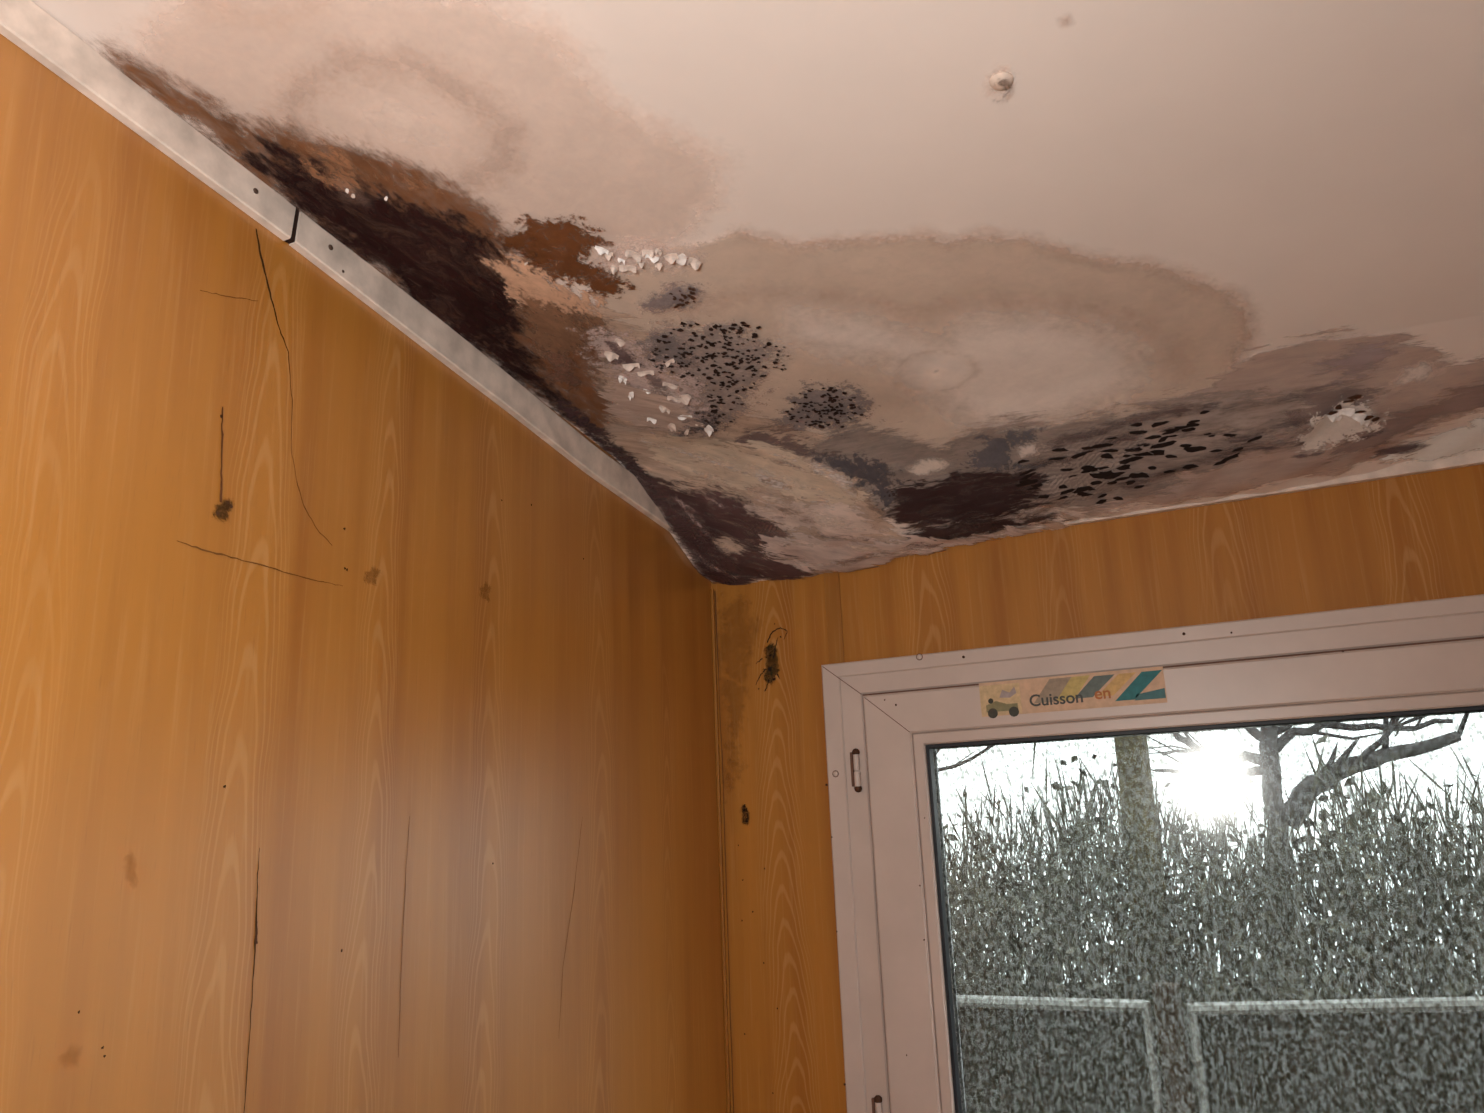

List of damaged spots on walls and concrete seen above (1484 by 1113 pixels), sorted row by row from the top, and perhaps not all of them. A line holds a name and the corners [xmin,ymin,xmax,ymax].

damp [104,0,1484,541]
peeling [1295,394,1484,464]
crack [244,848,260,1111]